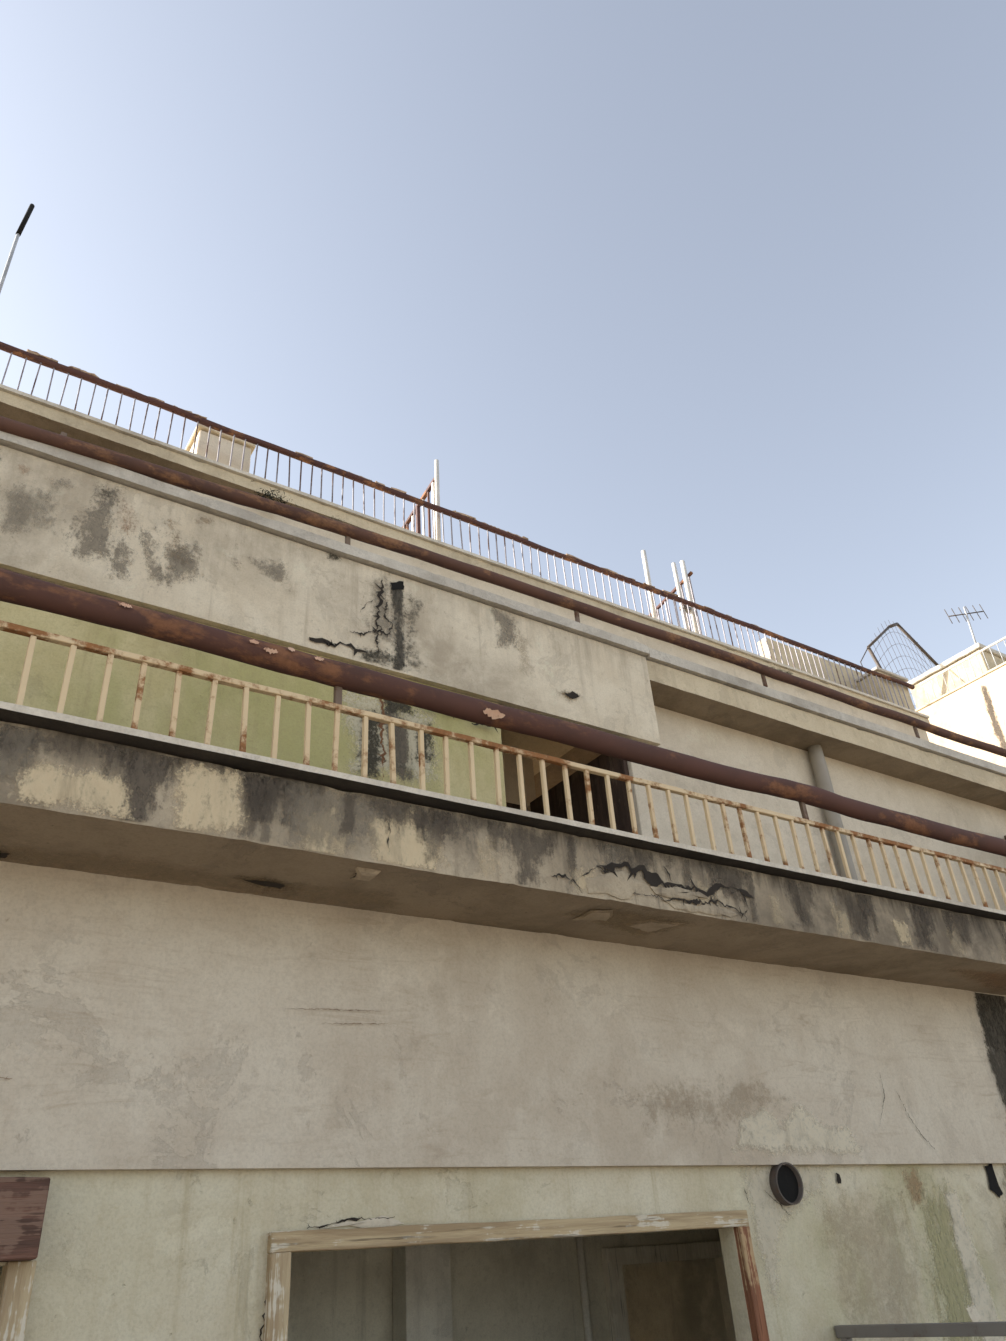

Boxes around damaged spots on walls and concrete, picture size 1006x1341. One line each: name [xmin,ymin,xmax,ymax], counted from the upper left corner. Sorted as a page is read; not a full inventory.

water stain [70,486,198,583]
crack [309,580,393,655]
water stain [0,724,178,822]
water stain [343,692,434,780]
water stain [981,686,1006,749]
water stain [242,776,591,890]
crack [552,861,754,921]
water stain [893,904,971,952]
water stain [975,993,1006,1105]